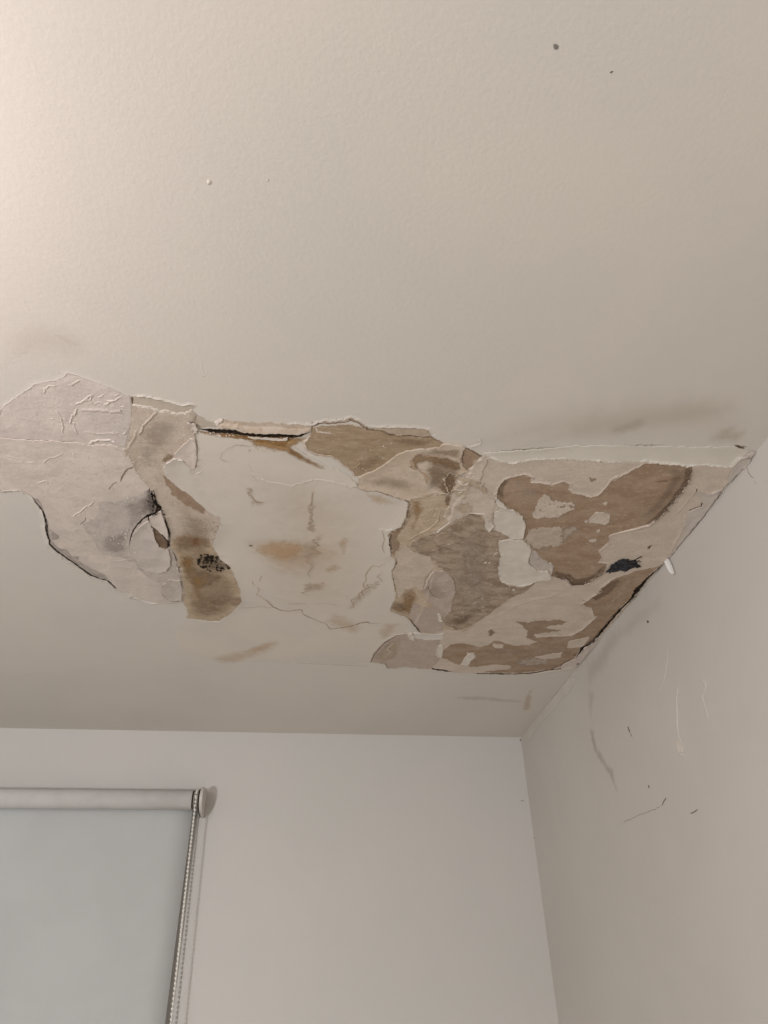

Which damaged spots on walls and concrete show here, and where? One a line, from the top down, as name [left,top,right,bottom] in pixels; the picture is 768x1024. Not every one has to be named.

crack [187,413,446,492]
crack [0,488,183,605]
mould [184,554,230,572]
peeling [82,394,756,675]
mould [606,545,652,574]